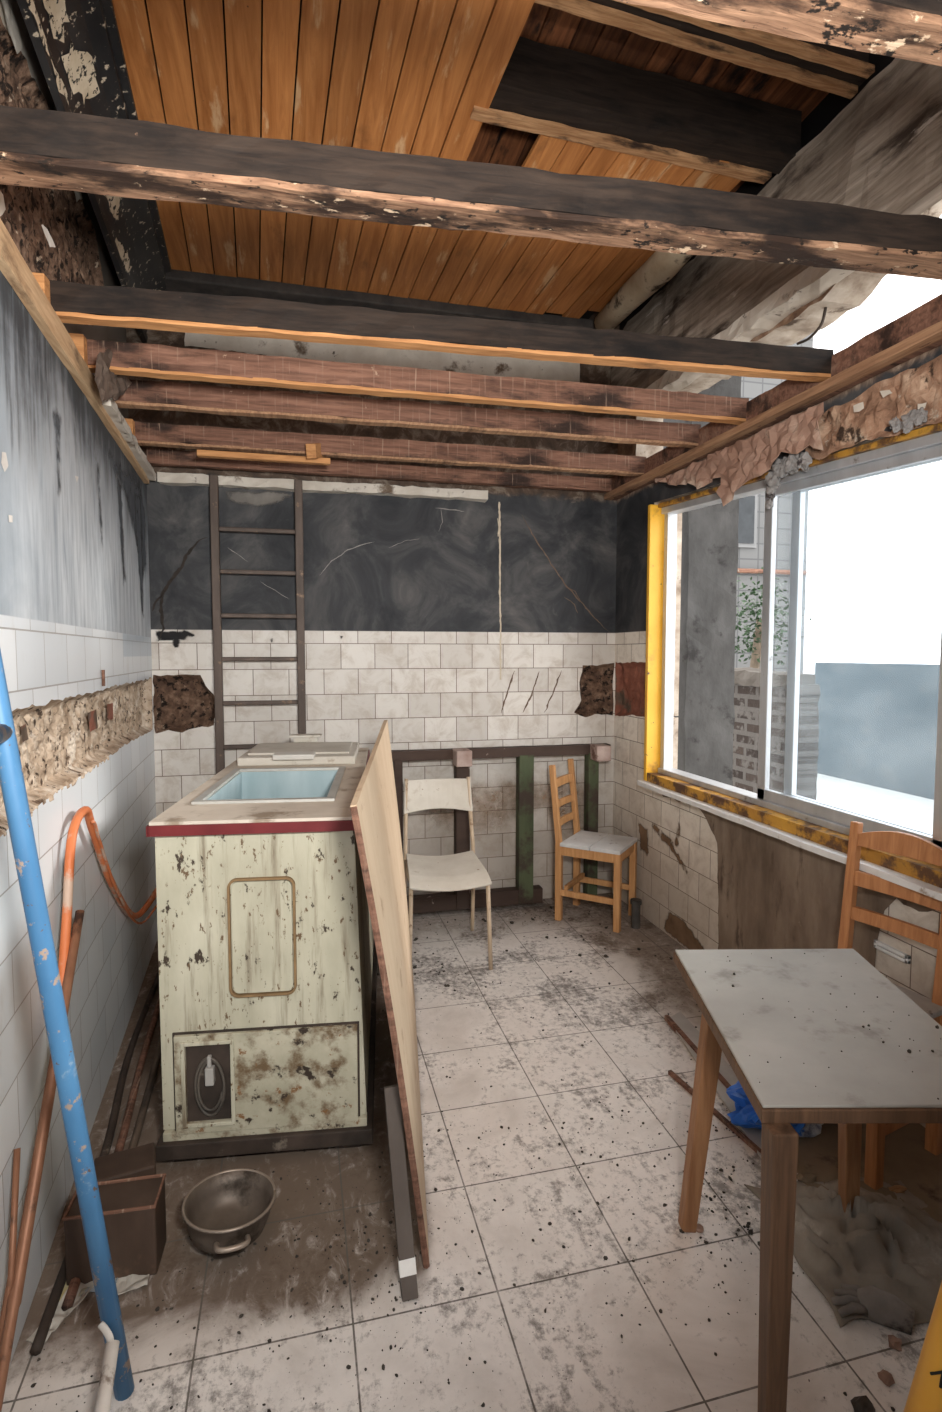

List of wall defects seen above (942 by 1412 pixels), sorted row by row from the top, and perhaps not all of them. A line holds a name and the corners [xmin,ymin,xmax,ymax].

spalling [0,0,100,111]
spalling [0,184,104,286]
peeling [104,195,123,220]
peeling [115,238,132,272]
spalling [712,266,854,342]
spalling [646,370,705,391]
spalling [805,354,942,460]
spalling [574,662,646,717]
spalling [12,674,215,817]
spalling [0,785,8,837]